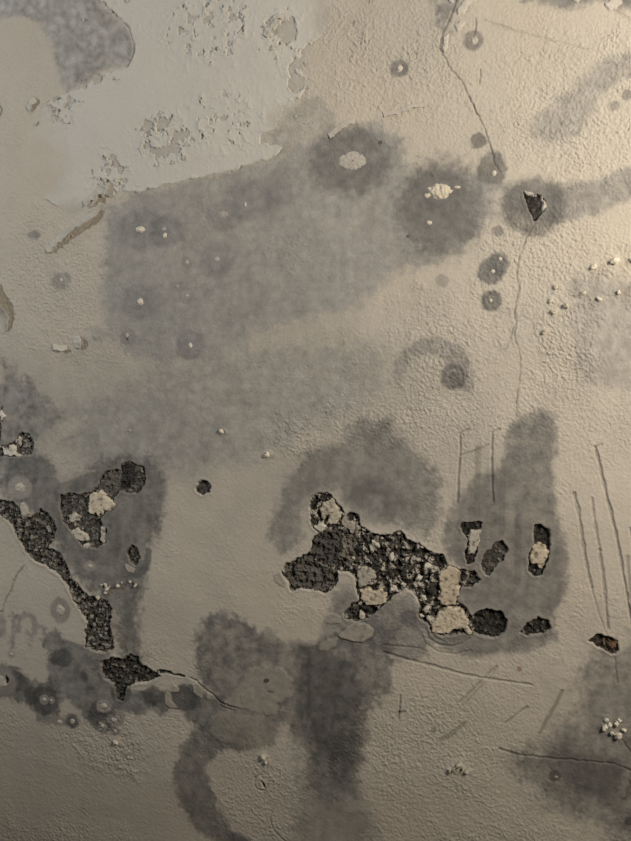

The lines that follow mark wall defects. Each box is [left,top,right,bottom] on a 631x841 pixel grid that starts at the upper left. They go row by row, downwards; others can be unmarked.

leakage [0,0,135,94]
peeling [21,0,333,253]
crack [438,0,502,174]
leakage [522,46,631,155]
leakage [0,94,631,666]
crack [505,222,536,418]
crack [0,565,25,614]
spalling [0,459,163,704]
leakage [0,581,435,841]
spalling [280,490,554,641]
leakage [482,624,631,841]
spalling [585,631,623,657]